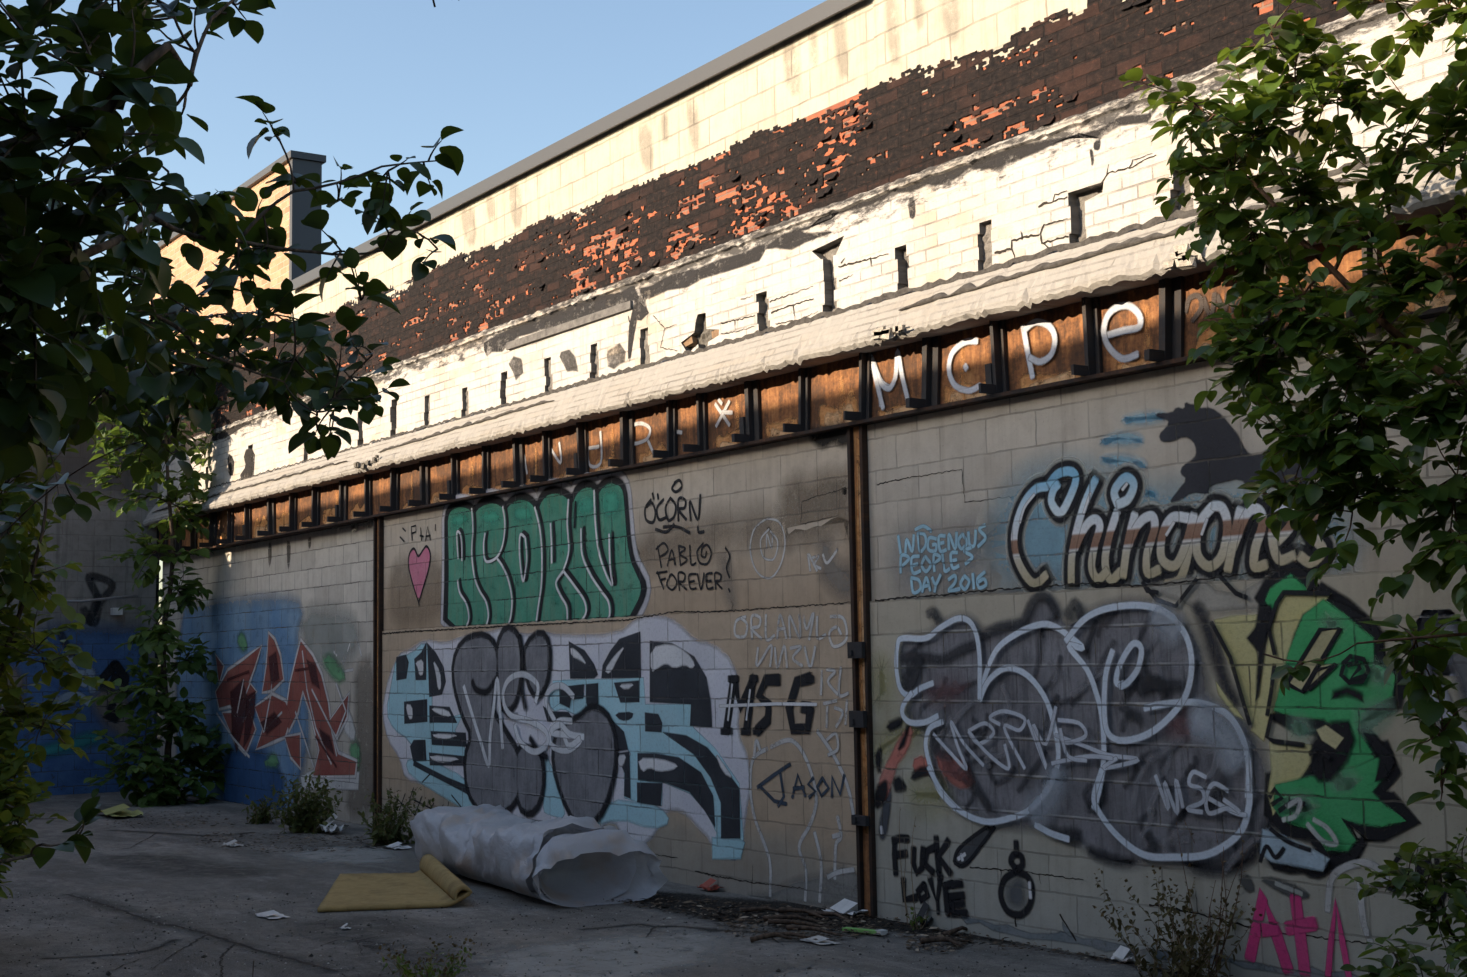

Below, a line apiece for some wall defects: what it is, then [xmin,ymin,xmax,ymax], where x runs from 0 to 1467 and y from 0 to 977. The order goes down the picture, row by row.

peeling [162,0,1350,444]
crack [152,132,1467,513]
corrosion [1117,313,1155,370]
corrosion [944,348,986,403]
corrosion [1020,371,1081,388]
corrosion [403,448,539,509]
corrosion [595,429,616,472]
corrosion [639,444,666,463]
corrosion [716,401,740,448]
corrosion [766,418,798,437]
corrosion [879,406,916,416]
corrosion [819,376,869,833]